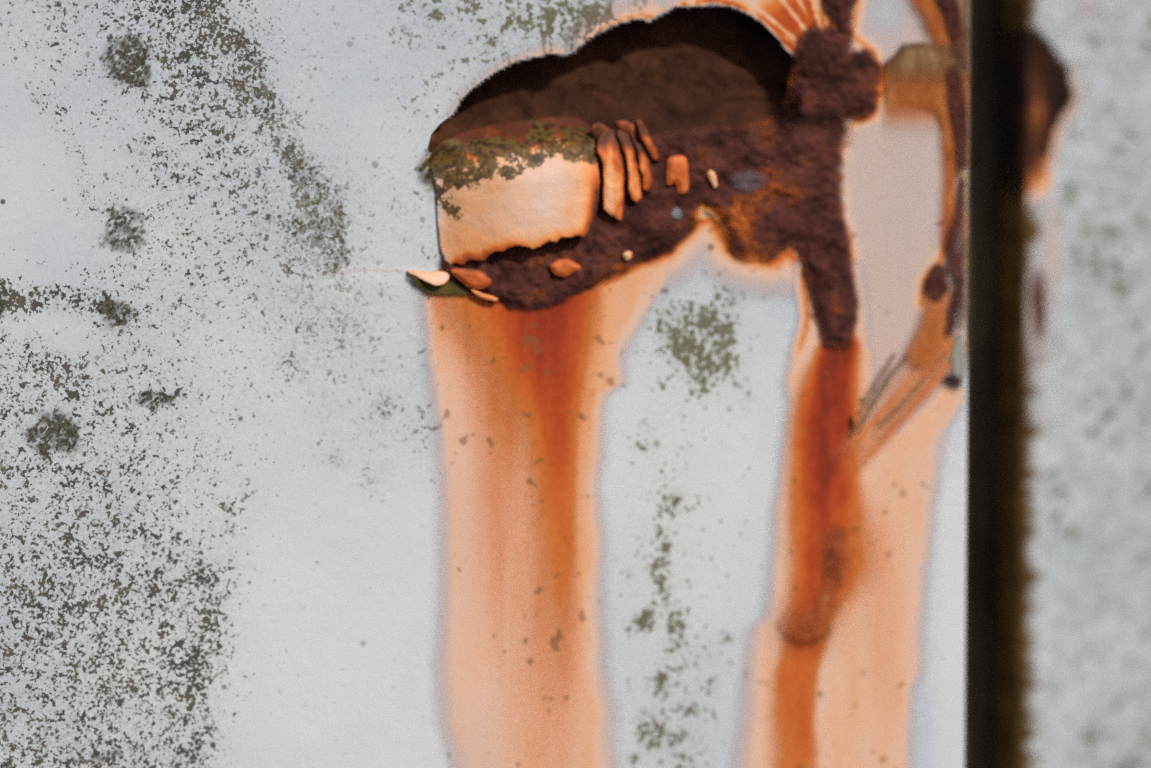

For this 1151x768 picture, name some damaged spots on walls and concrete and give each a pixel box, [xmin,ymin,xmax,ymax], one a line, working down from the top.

leakage [100,33,151,87]
spalling [428,4,802,302]
leakage [100,206,145,263]
leakage [100,300,137,332]
leakage [143,390,174,406]
rust [418,0,971,768]
leakage [25,409,80,463]